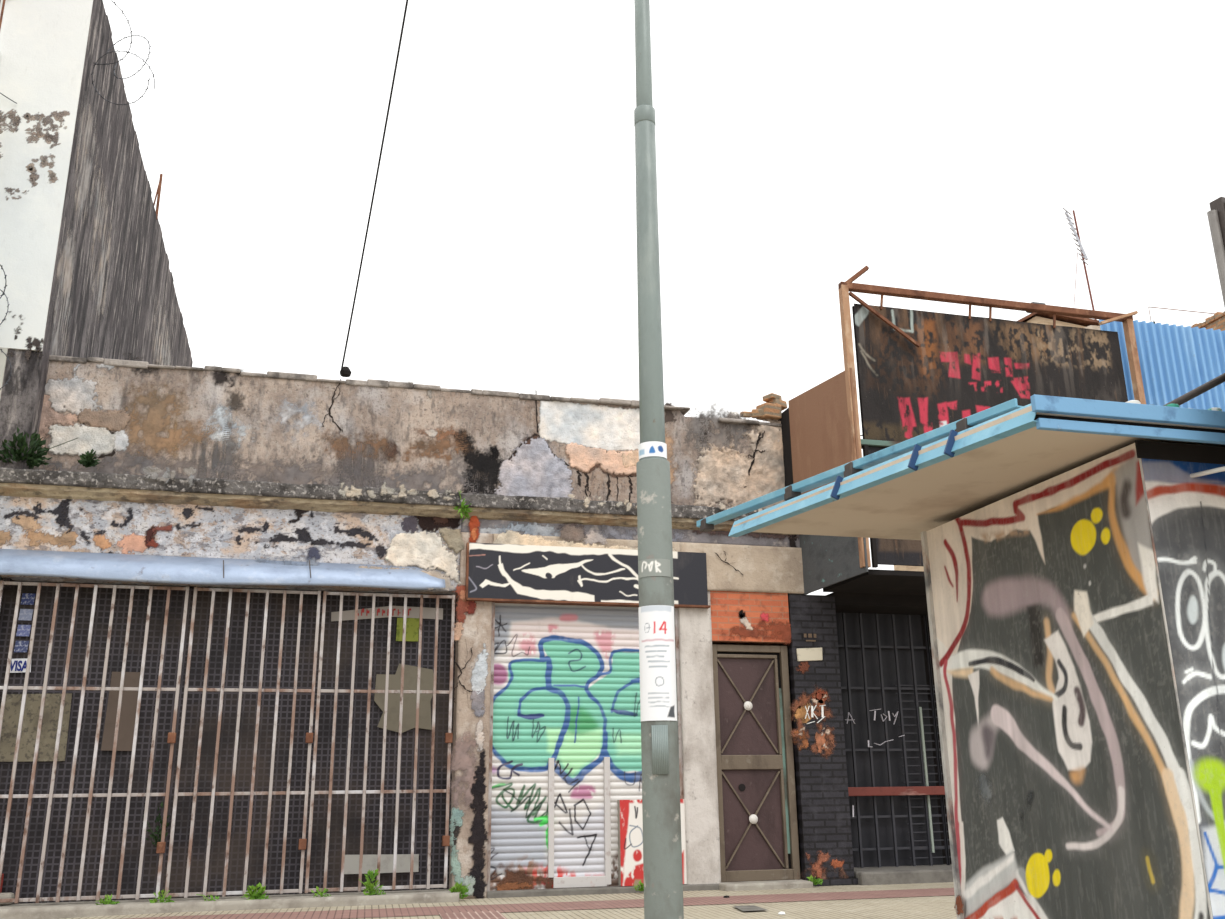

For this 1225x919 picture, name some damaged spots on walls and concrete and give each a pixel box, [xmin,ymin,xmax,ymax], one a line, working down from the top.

peeling [0,109,70,200]
peeling [0,499,157,554]
peeling [176,505,214,530]
damp [35,369,500,494]
peeling [236,509,404,569]
spalling [338,482,455,500]
peeling [401,516,418,533]
peeling [433,516,638,554]
spalling [494,436,639,511]
crack [508,391,633,502]